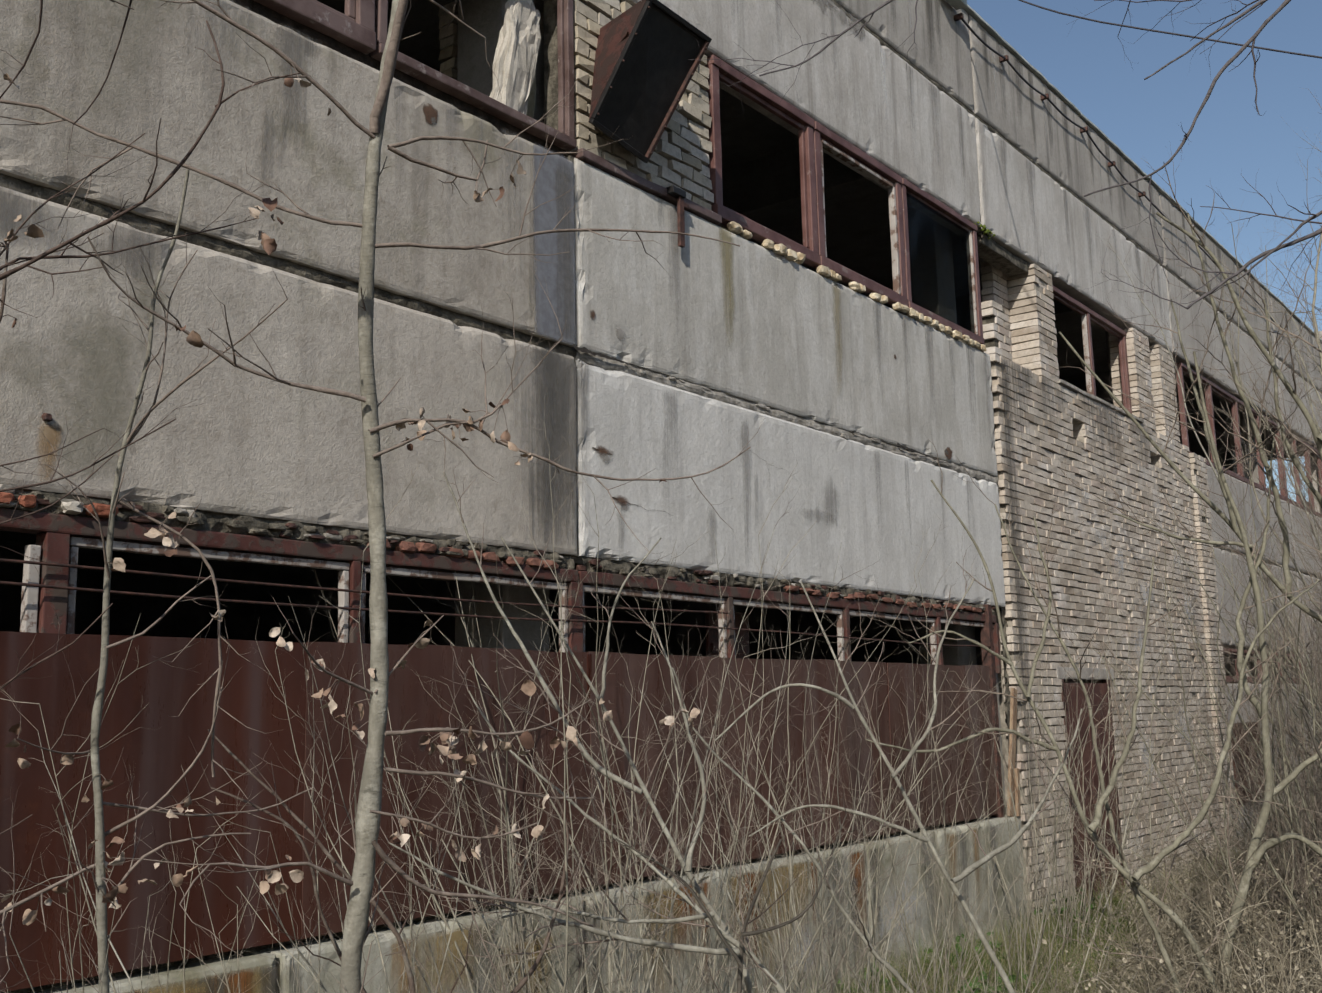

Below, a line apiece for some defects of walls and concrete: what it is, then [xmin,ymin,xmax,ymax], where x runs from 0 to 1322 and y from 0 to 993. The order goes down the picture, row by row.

leakage [532,145,583,522]
rust [41,413,60,468]
spalling [0,484,369,548]
spalling [386,533,997,615]
rust [426,928,477,993]
rust [505,938,551,993]
rust [647,881,708,964]
rust [731,861,818,954]
rust [850,852,866,942]